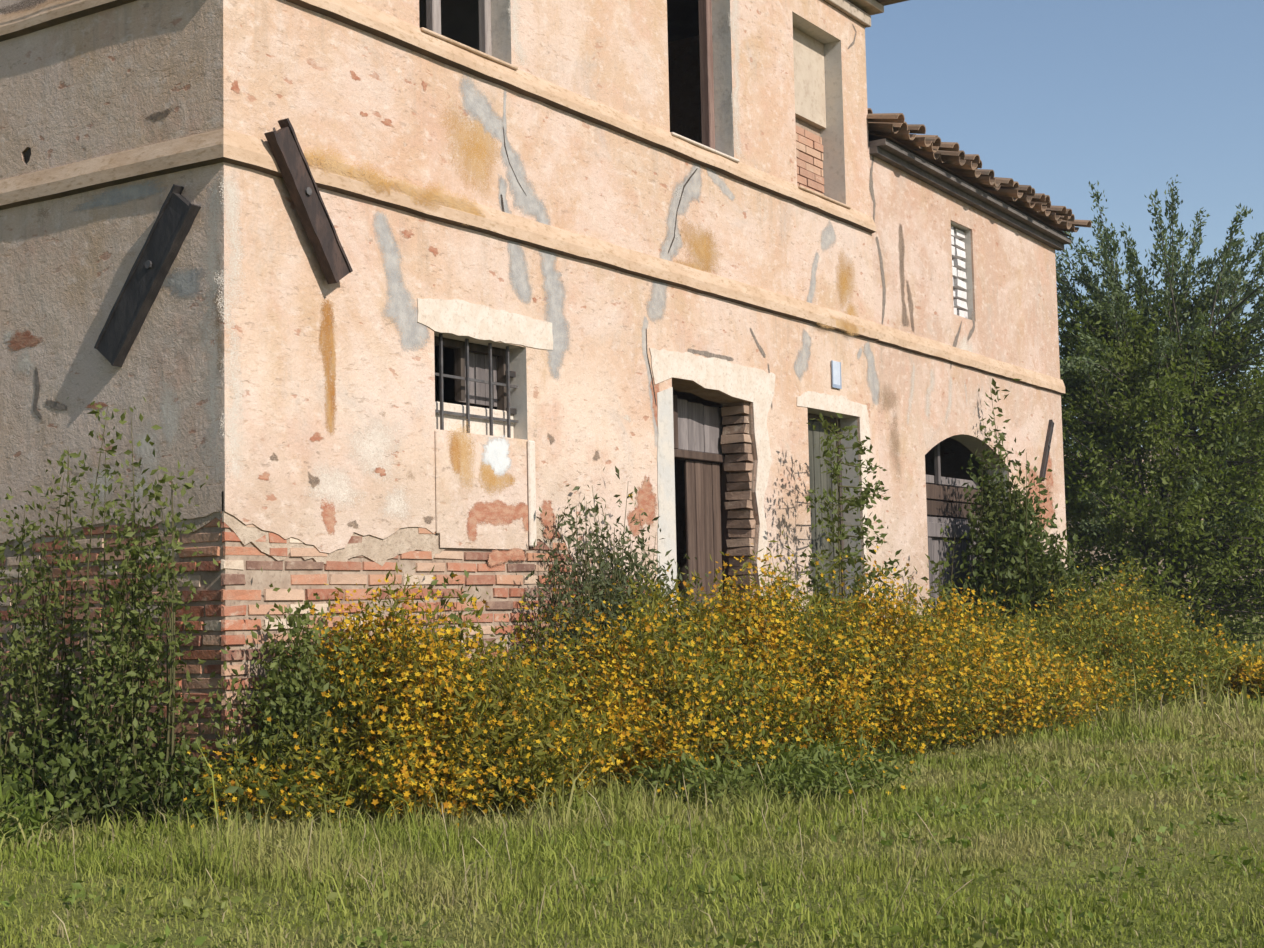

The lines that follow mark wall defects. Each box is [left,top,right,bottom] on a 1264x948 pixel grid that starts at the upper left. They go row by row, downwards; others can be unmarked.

leakage [0,0,53,15]
crack [458,72,571,381]
rust [318,299,338,435]
crack [641,163,735,447]
crack [687,217,837,381]
peeling [85,374,184,508]
spalling [258,453,278,482]
peeling [481,435,512,477]
spalling [627,476,657,541]
flaking render [0,472,590,810]